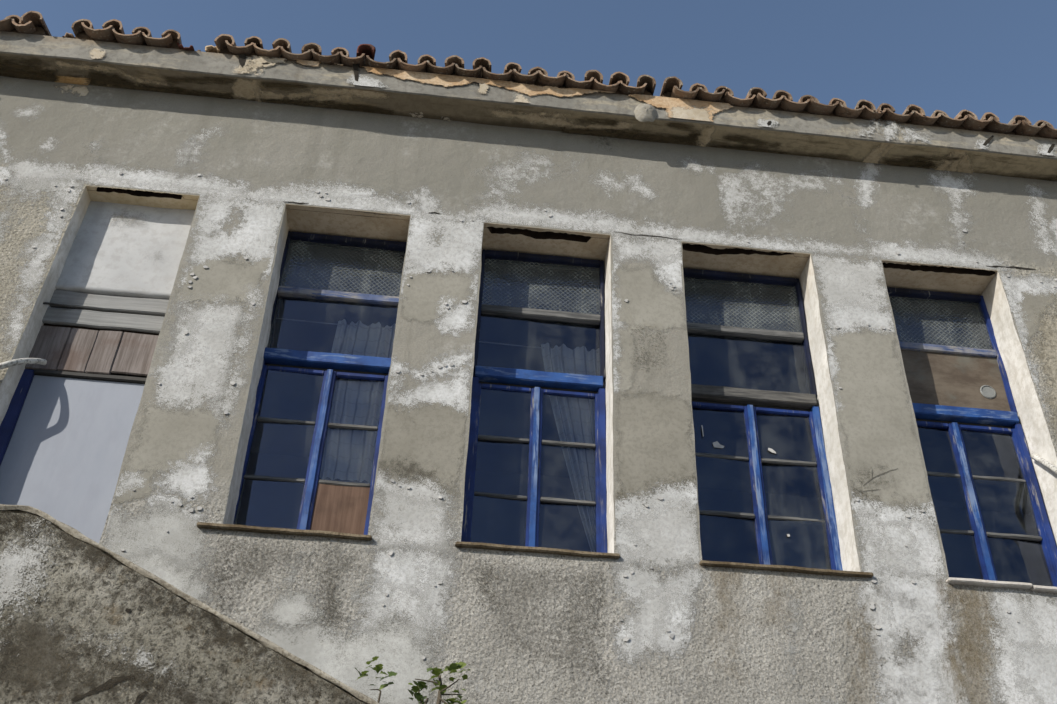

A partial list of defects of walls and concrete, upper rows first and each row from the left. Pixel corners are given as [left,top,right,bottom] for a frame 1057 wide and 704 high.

spalling [90,48,105,59]
spalling [177,42,220,53]
spalling [232,55,286,102]
spalling [346,74,388,88]
water stain [1022,178,1057,261]